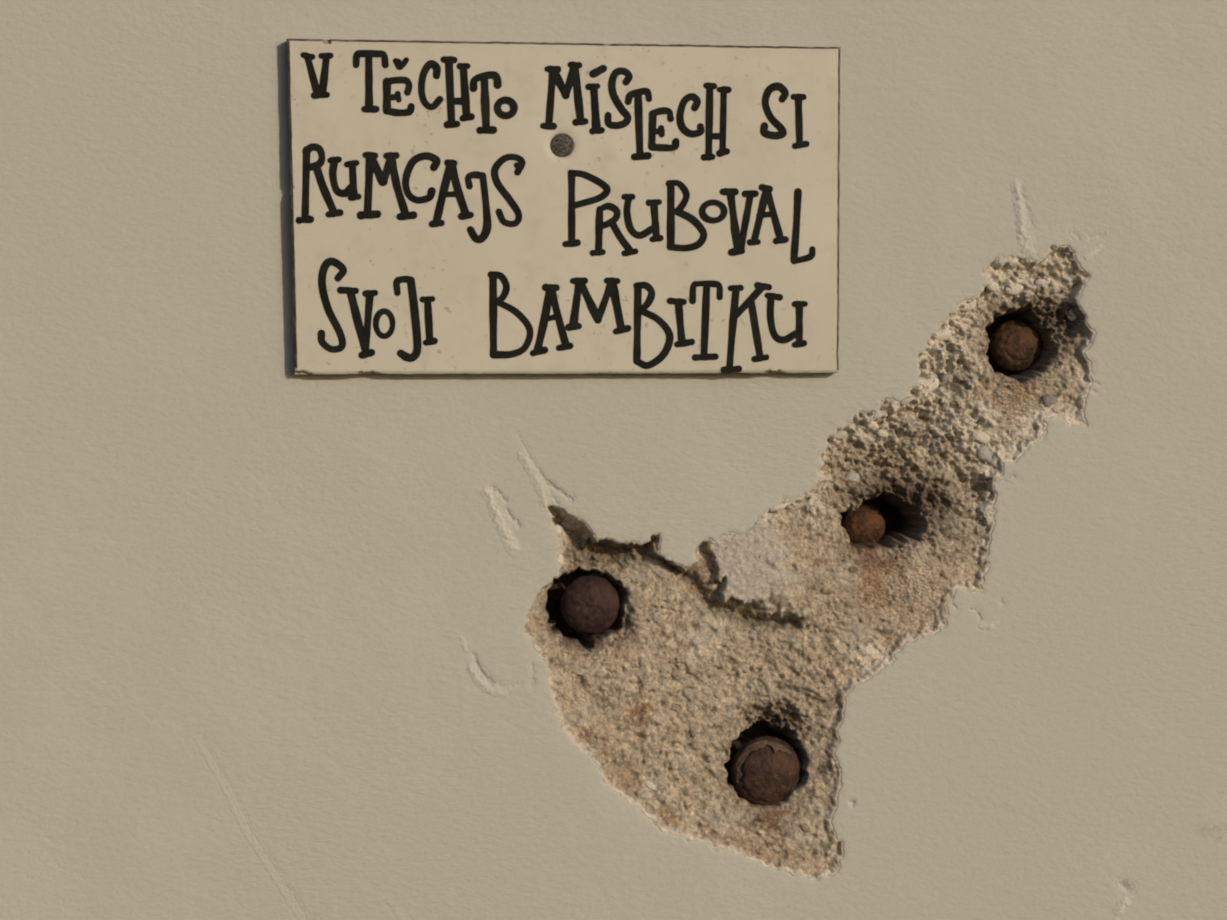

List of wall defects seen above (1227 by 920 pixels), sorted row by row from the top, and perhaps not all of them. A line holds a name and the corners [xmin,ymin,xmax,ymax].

corrosion [735,740,791,783]
flaking render [458,245,1103,881]